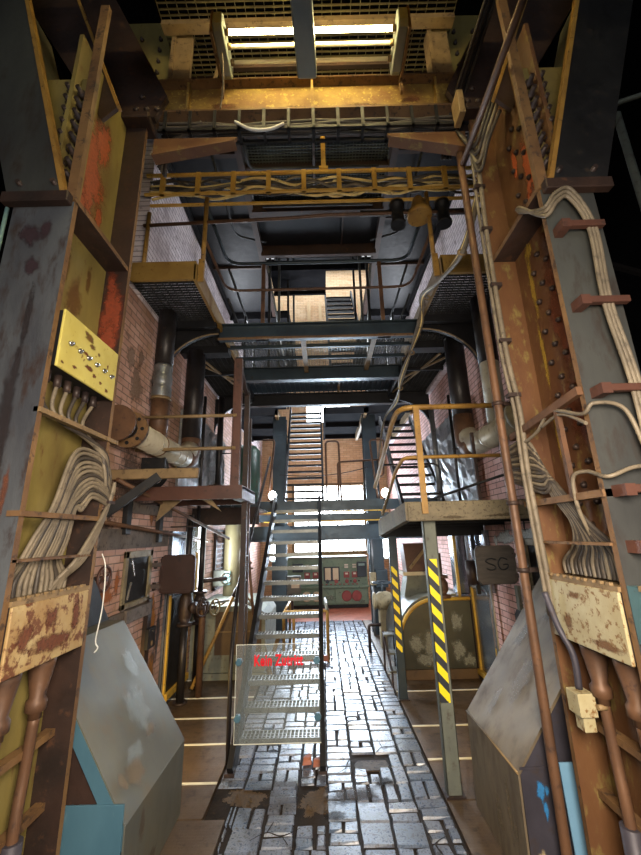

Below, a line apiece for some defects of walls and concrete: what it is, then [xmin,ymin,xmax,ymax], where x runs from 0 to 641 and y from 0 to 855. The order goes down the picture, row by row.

rust [511,138,535,200]
spalling [297,785,329,818]